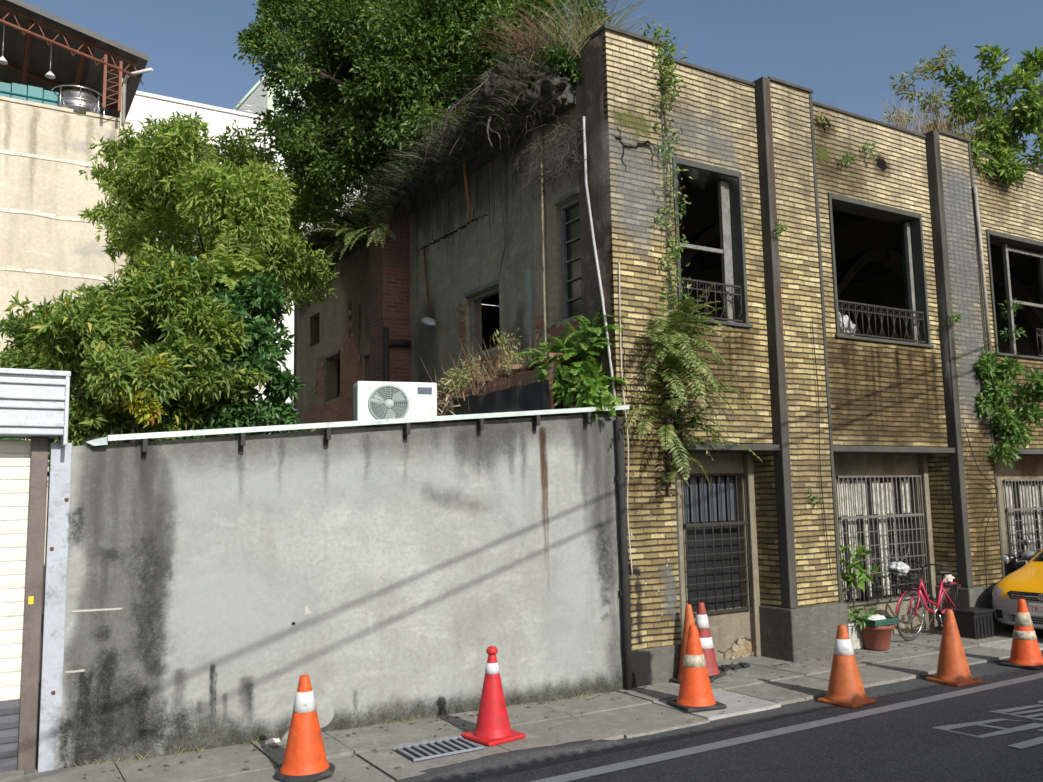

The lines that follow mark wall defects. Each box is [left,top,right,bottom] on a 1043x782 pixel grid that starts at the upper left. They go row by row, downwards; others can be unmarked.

crack [611,126,655,173]
crack [420,211,509,278]
spalling [452,32,649,413]
spalling [303,339,363,432]
damp [56,441,391,768]